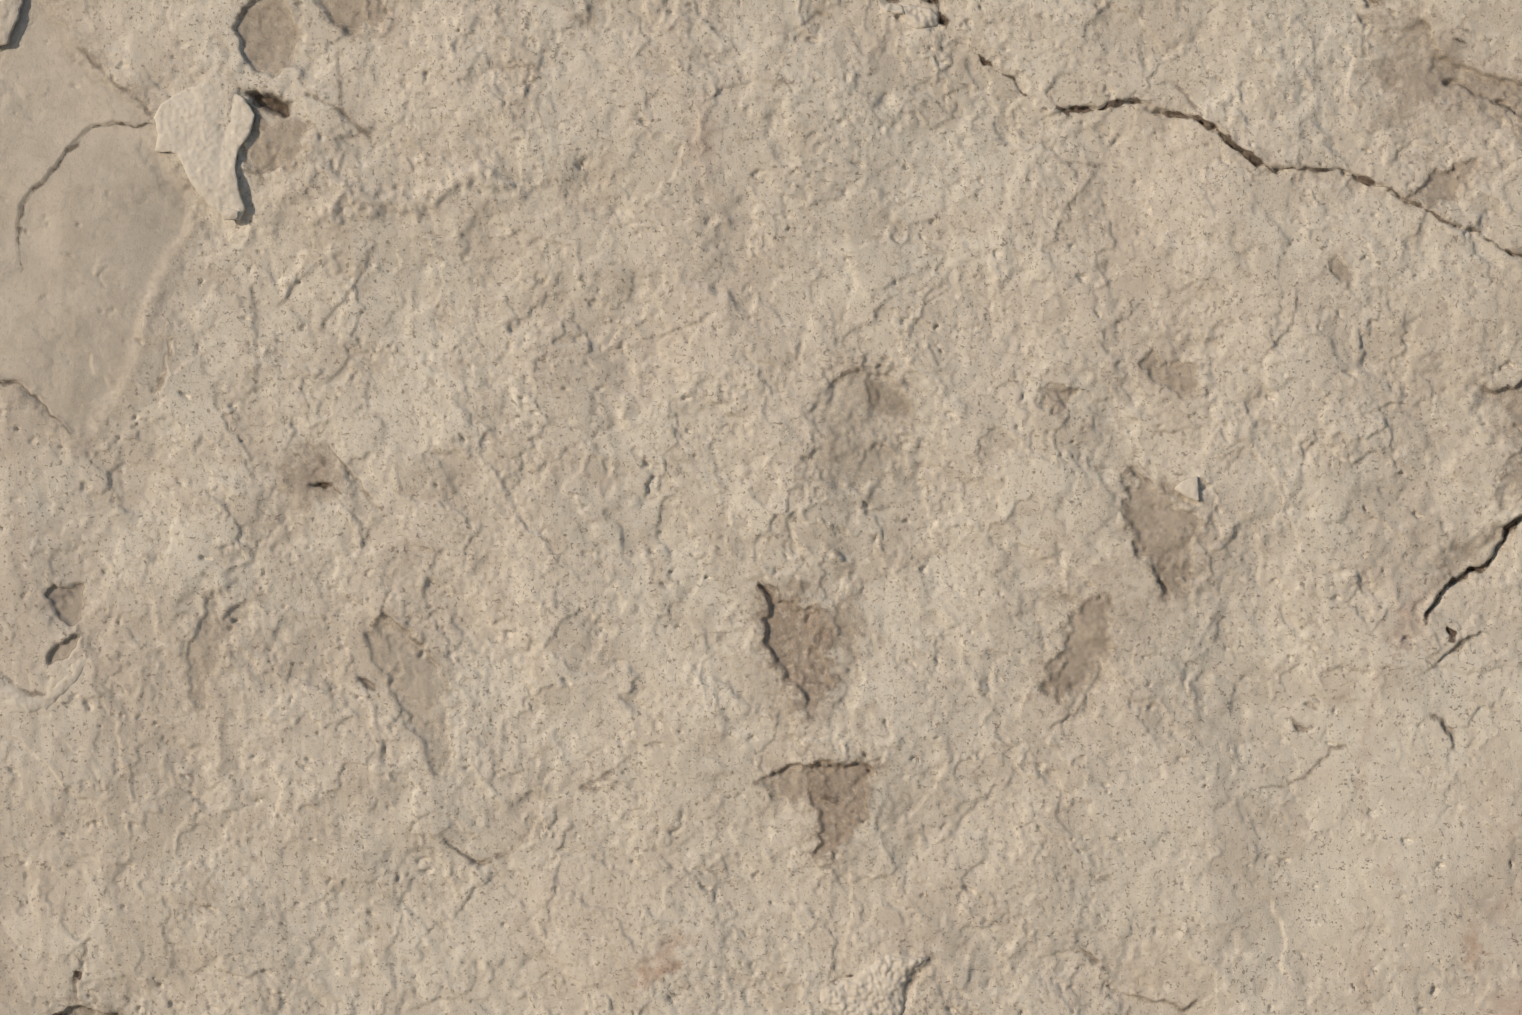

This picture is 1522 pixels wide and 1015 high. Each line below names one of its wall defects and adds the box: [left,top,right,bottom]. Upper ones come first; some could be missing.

peeling [0,0,305,438]
crack [978,54,1522,257]
spalling [756,583,862,712]
spalling [1043,601,1109,695]
spalling [1124,468,1200,597]
crack [1425,517,1522,652]
spalling [755,758,879,861]